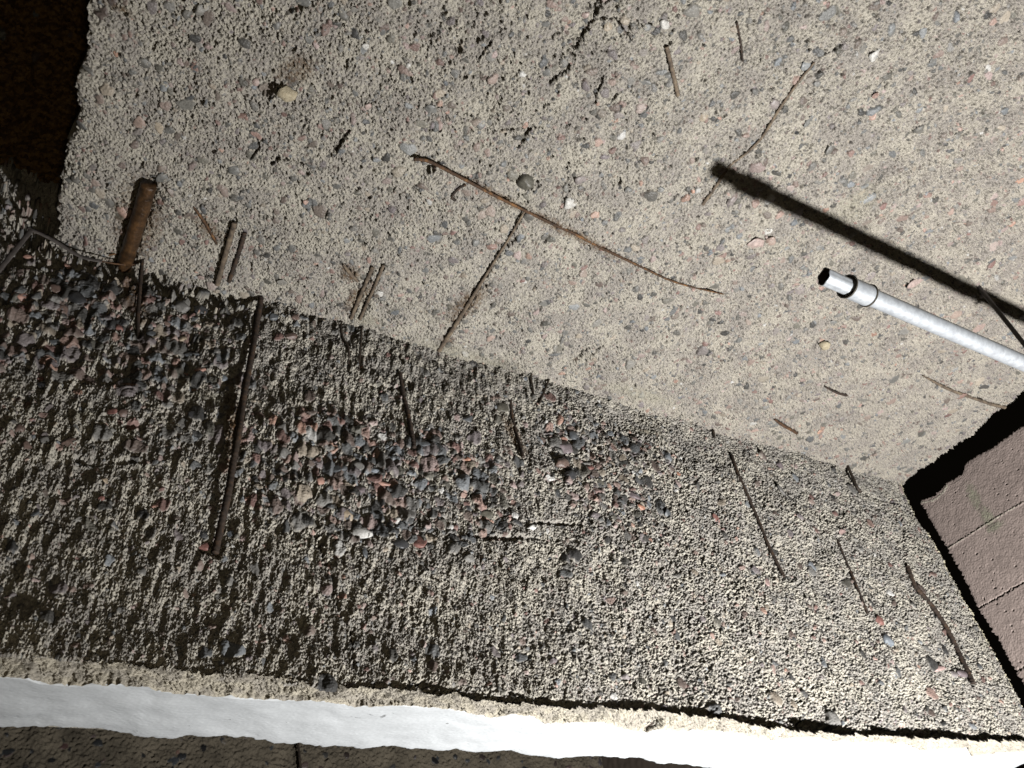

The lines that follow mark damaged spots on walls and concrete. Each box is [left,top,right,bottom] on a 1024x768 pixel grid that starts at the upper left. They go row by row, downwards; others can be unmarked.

spalling [116,179,157,338]
spalling [193,206,247,286]
spalling [413,157,724,353]
spalling [343,264,385,320]
spalling [567,344,602,366]
spalling [194,296,264,556]
spalling [357,372,421,449]
spalling [509,400,525,458]
spalling [110,457,145,468]
spalling [315,531,328,554]
spalling [453,521,590,542]